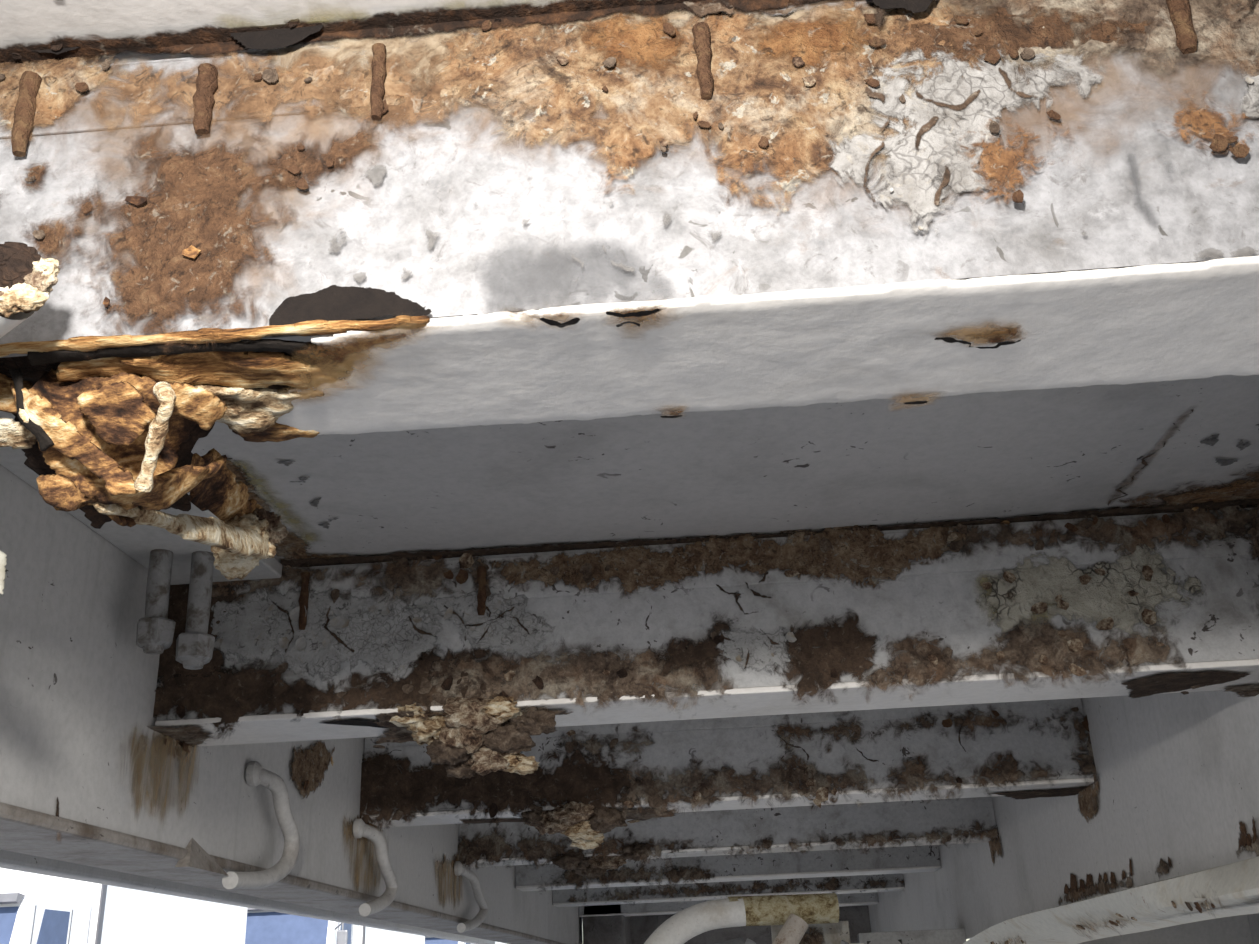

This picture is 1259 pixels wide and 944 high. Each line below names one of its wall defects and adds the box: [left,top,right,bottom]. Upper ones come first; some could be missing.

rust [0,47,470,139]
peeling [831,14,1103,235]
peeling [1195,247,1258,259]
peeling [0,258,60,318]
rust [506,311,580,328]
rust [606,306,661,327]
rust [934,324,1021,349]
peeling [976,540,1204,636]
peeling [211,553,554,704]
peeling [713,627,797,674]
peeling [1122,671,1259,698]
peeling [989,786,1089,800]